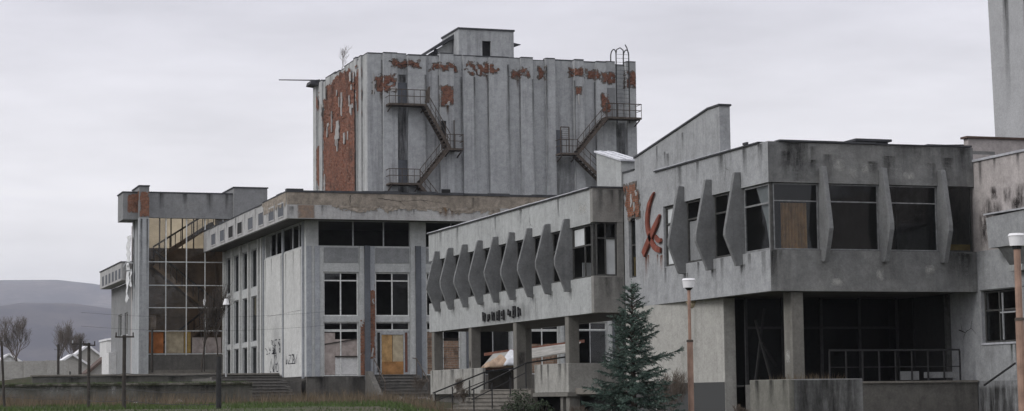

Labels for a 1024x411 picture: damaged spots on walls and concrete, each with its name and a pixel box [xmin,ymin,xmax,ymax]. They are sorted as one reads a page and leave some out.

spalling [567,66,636,113]
spalling [316,58,547,191]
spalling [128,191,149,216]
spalling [623,181,641,222]
water stain [981,188,1022,236]